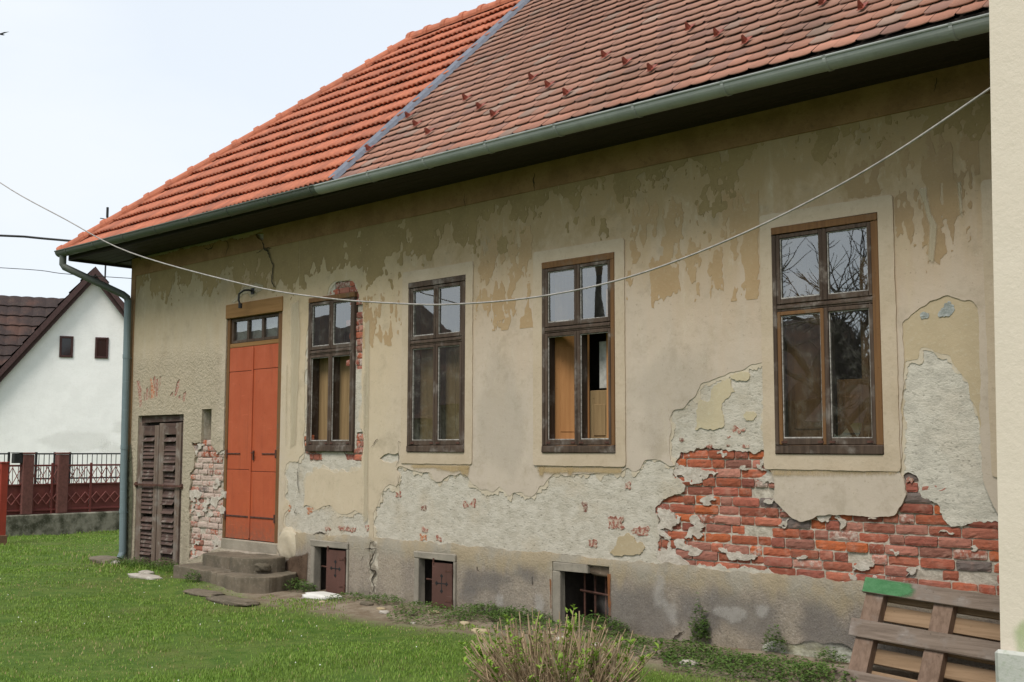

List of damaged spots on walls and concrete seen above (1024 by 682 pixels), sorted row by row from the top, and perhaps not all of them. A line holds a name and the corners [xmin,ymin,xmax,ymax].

crack [259,242,275,287]
peeling [793,94,991,273]
flaking render [136,142,1000,596]
crack [362,548,376,593]